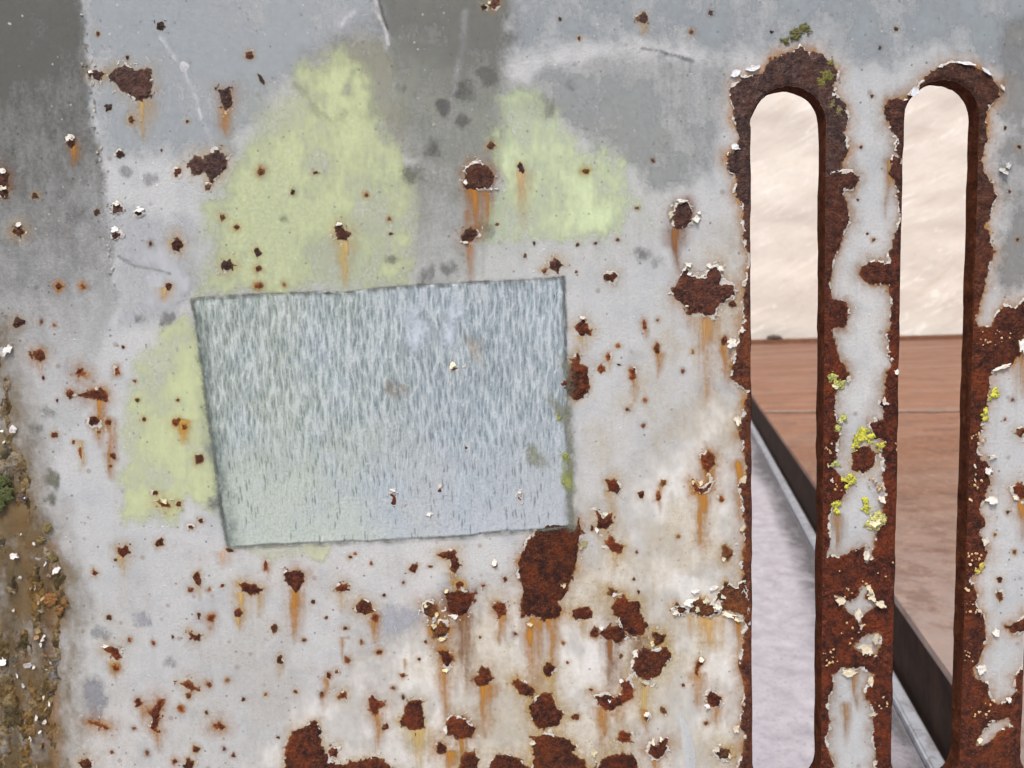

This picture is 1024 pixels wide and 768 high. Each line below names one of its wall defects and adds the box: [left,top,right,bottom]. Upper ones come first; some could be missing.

rust [82,60,158,124]
rust [172,145,234,190]
rust [459,156,499,260]
rust [725,44,1024,768]
rust [668,199,752,768]
peeling [0,629,52,695]
rust [281,567,304,628]
rust [367,507,679,768]
peeling [669,580,751,644]
rust [283,720,393,768]